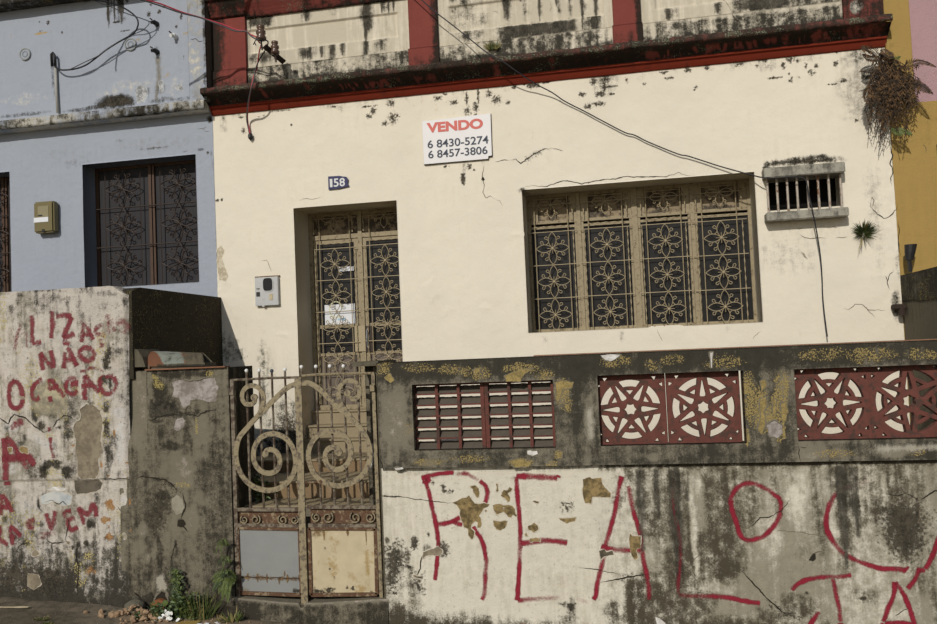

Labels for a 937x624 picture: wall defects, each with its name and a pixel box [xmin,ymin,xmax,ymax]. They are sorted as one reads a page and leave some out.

damp [504,0,597,38]
crack [481,148,562,203]
crack [523,172,689,188]
flaking render [171,376,219,431]
flaking render [40,402,104,506]
peeling [452,483,517,540]
peeling [581,477,612,505]
damp [636,468,689,574]
damp [830,466,860,568]
damp [875,495,934,563]
corrosion [241,572,299,584]
crack [411,557,426,595]